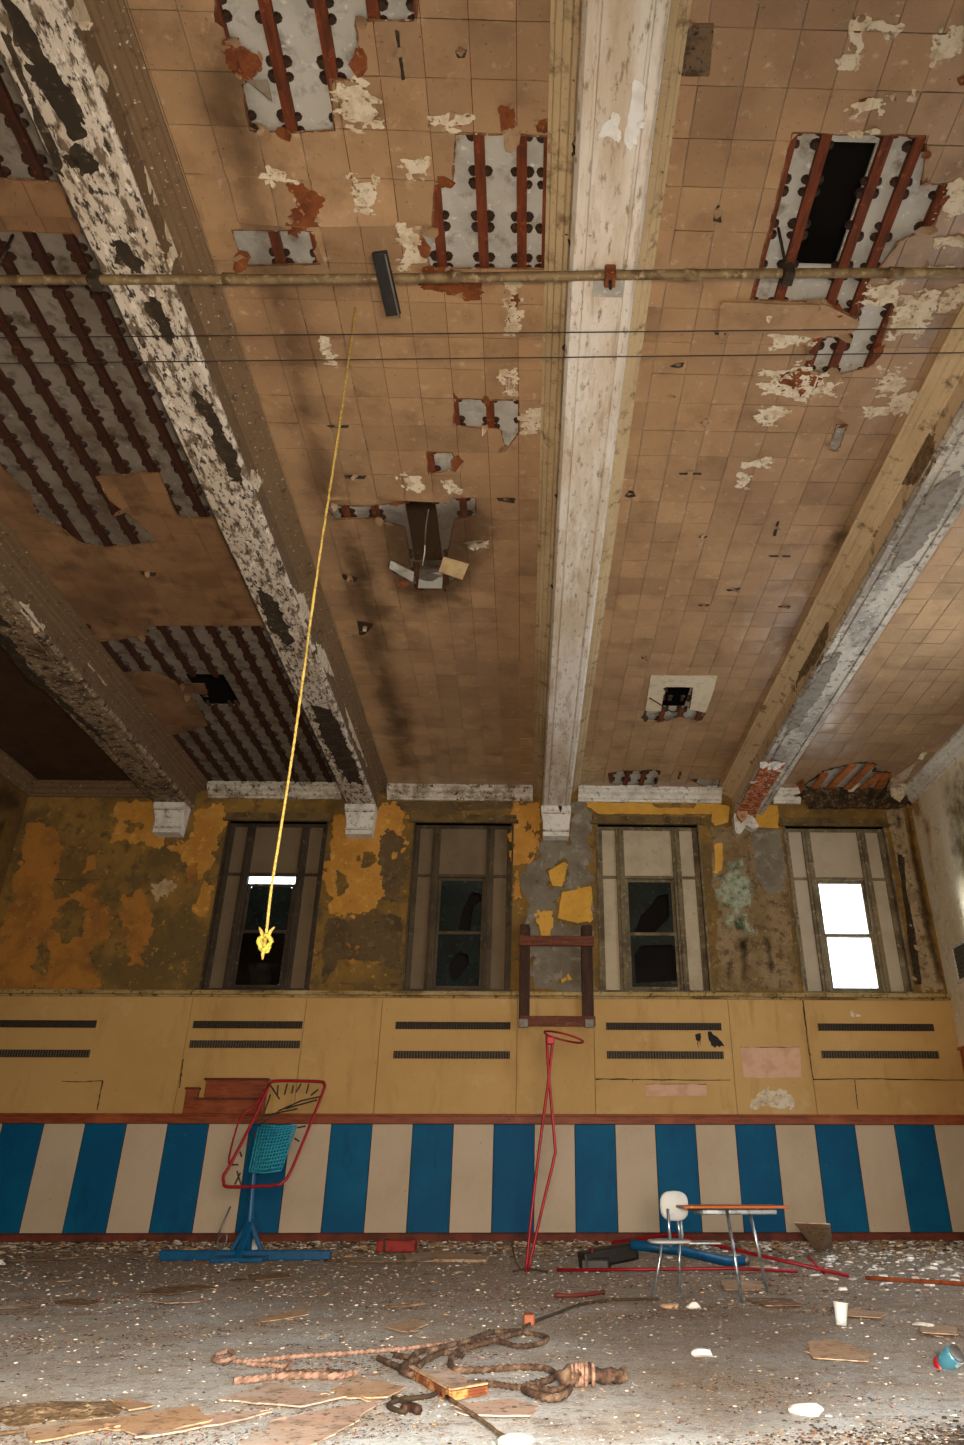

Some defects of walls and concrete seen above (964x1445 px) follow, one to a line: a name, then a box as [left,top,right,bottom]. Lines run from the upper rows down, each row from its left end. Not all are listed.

peeling [221,46,263,80]
peeling [835,14,905,72]
peeling [929,16,964,68]
peeling [329,75,385,134]
peeling [840,89,916,138]
peeling [109,222,182,274]
peeling [856,178,964,341]
peeling [144,296,175,345]
peeling [310,705,367,785]
peeling [0,799,228,989]
peeling [321,761,799,993]
peeling [886,807,944,993]